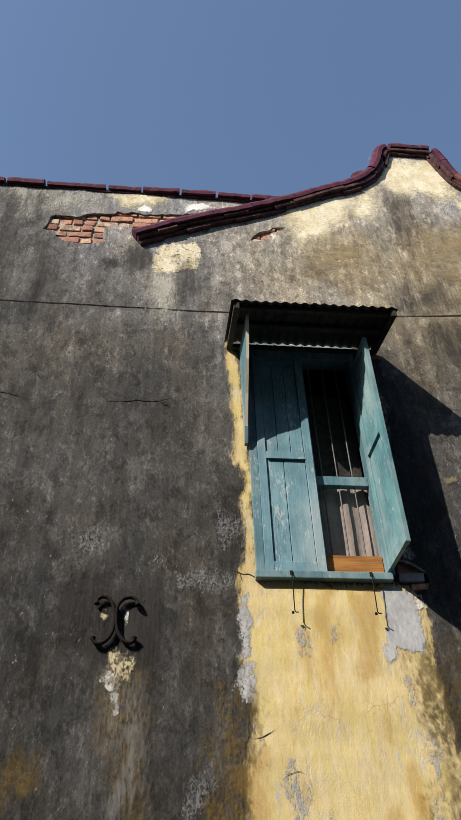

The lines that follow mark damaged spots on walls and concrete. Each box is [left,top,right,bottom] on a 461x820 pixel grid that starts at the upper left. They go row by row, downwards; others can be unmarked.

spalling [46,213,180,244]
spalling [251,228,283,241]
leakage [102,593,154,664]
peeling [234,592,257,703]
peeling [380,560,429,663]
peeling [99,651,137,814]